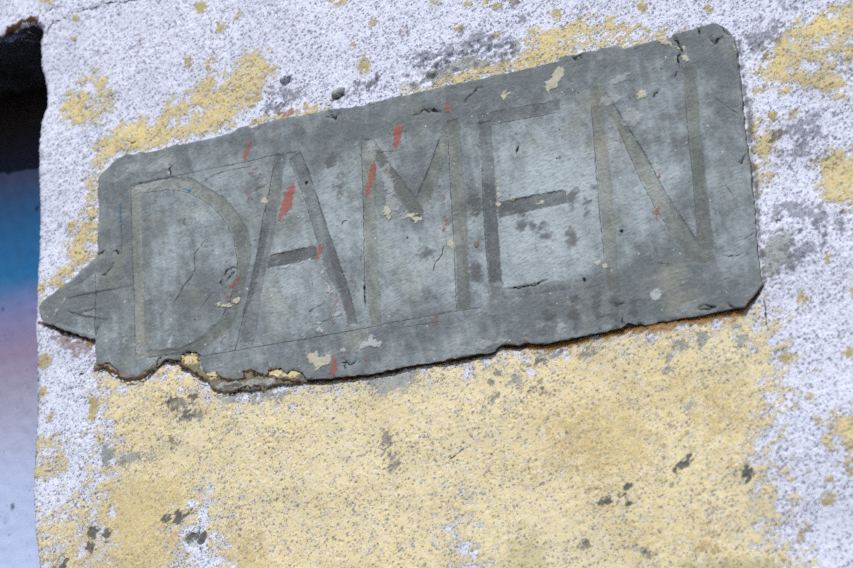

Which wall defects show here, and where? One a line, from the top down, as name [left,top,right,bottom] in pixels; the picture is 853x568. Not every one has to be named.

flaking render [763,226,803,280]
spalling [662,330,708,374]
flaking render [93,352,309,406]
flaking render [358,370,420,398]
flaking render [101,443,158,470]
spalling [673,453,695,473]
spalling [742,465,755,485]
spalling [597,482,633,506]
spalling [160,508,194,525]
spalling [85,526,111,553]
spalling [185,530,207,548]